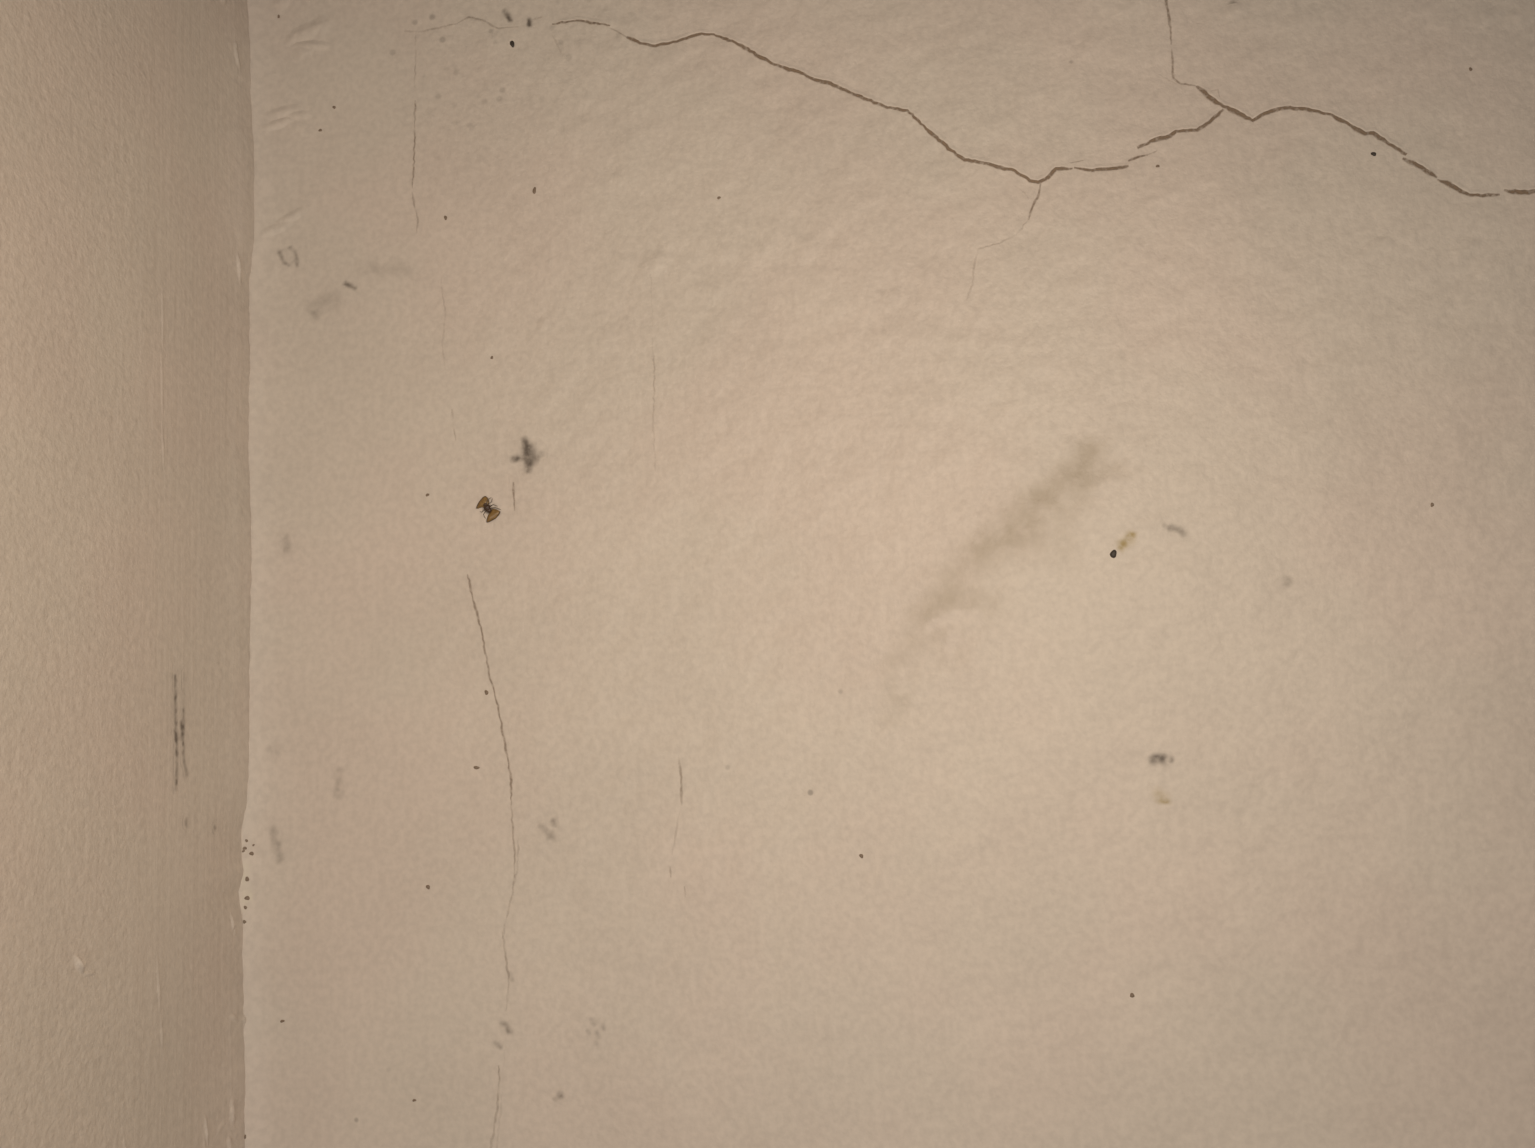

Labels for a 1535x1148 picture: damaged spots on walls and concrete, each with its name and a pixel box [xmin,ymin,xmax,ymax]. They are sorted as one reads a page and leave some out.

crack [552,16,1535,210]